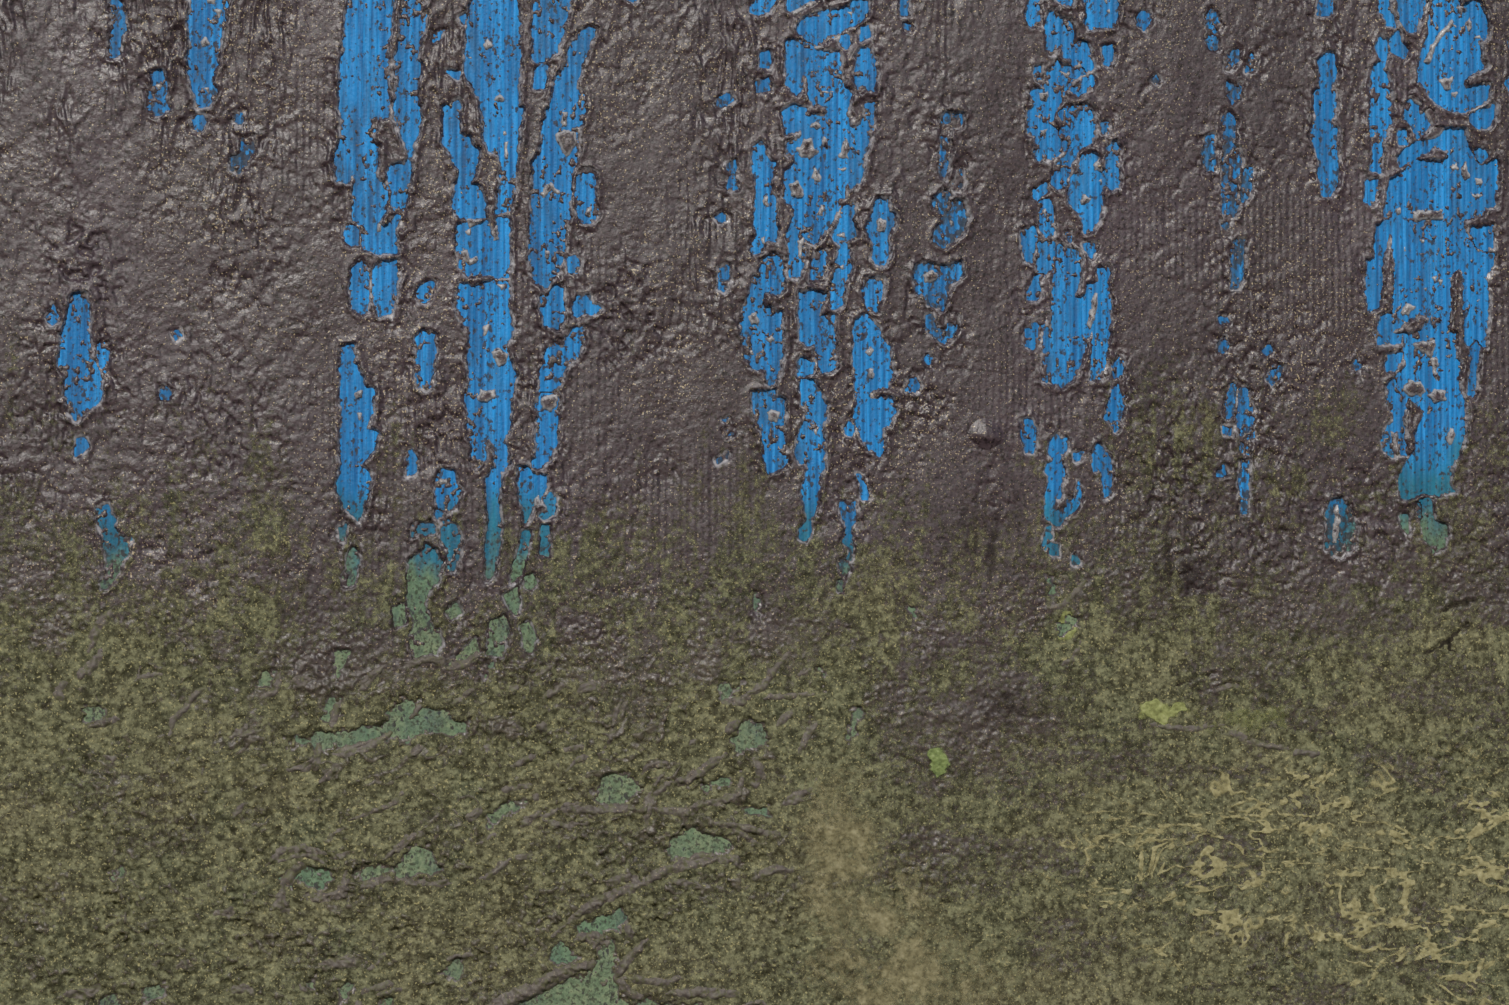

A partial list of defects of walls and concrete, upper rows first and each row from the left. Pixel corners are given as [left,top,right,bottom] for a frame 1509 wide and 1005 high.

peeling [46,294,110,457]
peeling [186,0,228,132]
peeling [336,344,379,586]
peeling [334,0,445,317]
peeling [392,0,601,678]
peeling [726,0,969,541]
peeling [1021,419,1112,565]
peeling [1020,0,1125,433]
peeling [1311,53,1339,197]
peeling [1363,0,1509,554]
damp [798,756,1052,1005]
damp [1054,746,1509,1005]